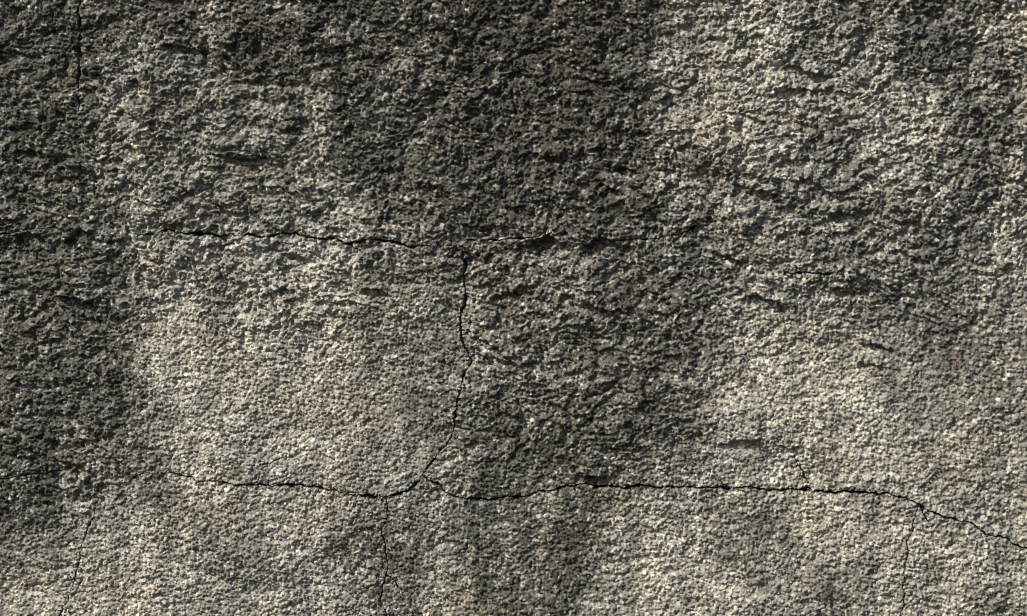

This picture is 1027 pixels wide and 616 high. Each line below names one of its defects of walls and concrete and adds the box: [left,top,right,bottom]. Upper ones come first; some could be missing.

crack [72,0,85,114]
crack [129,212,1027,616]
crack [0,466,69,482]
crack [23,581,42,589]
crack [55,484,102,616]